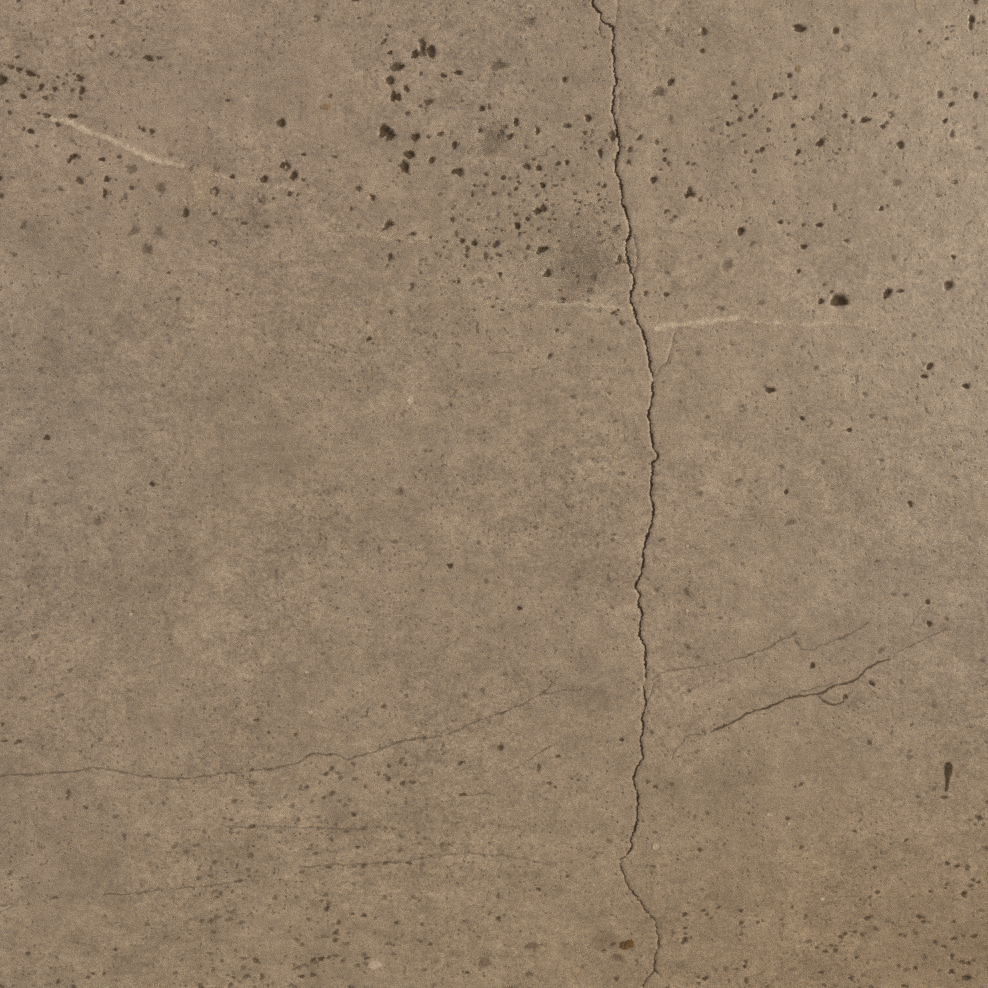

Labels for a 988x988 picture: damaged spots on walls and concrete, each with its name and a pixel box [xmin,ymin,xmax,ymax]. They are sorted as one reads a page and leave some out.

crack [591,0,660,987]
crack [712,659,890,732]